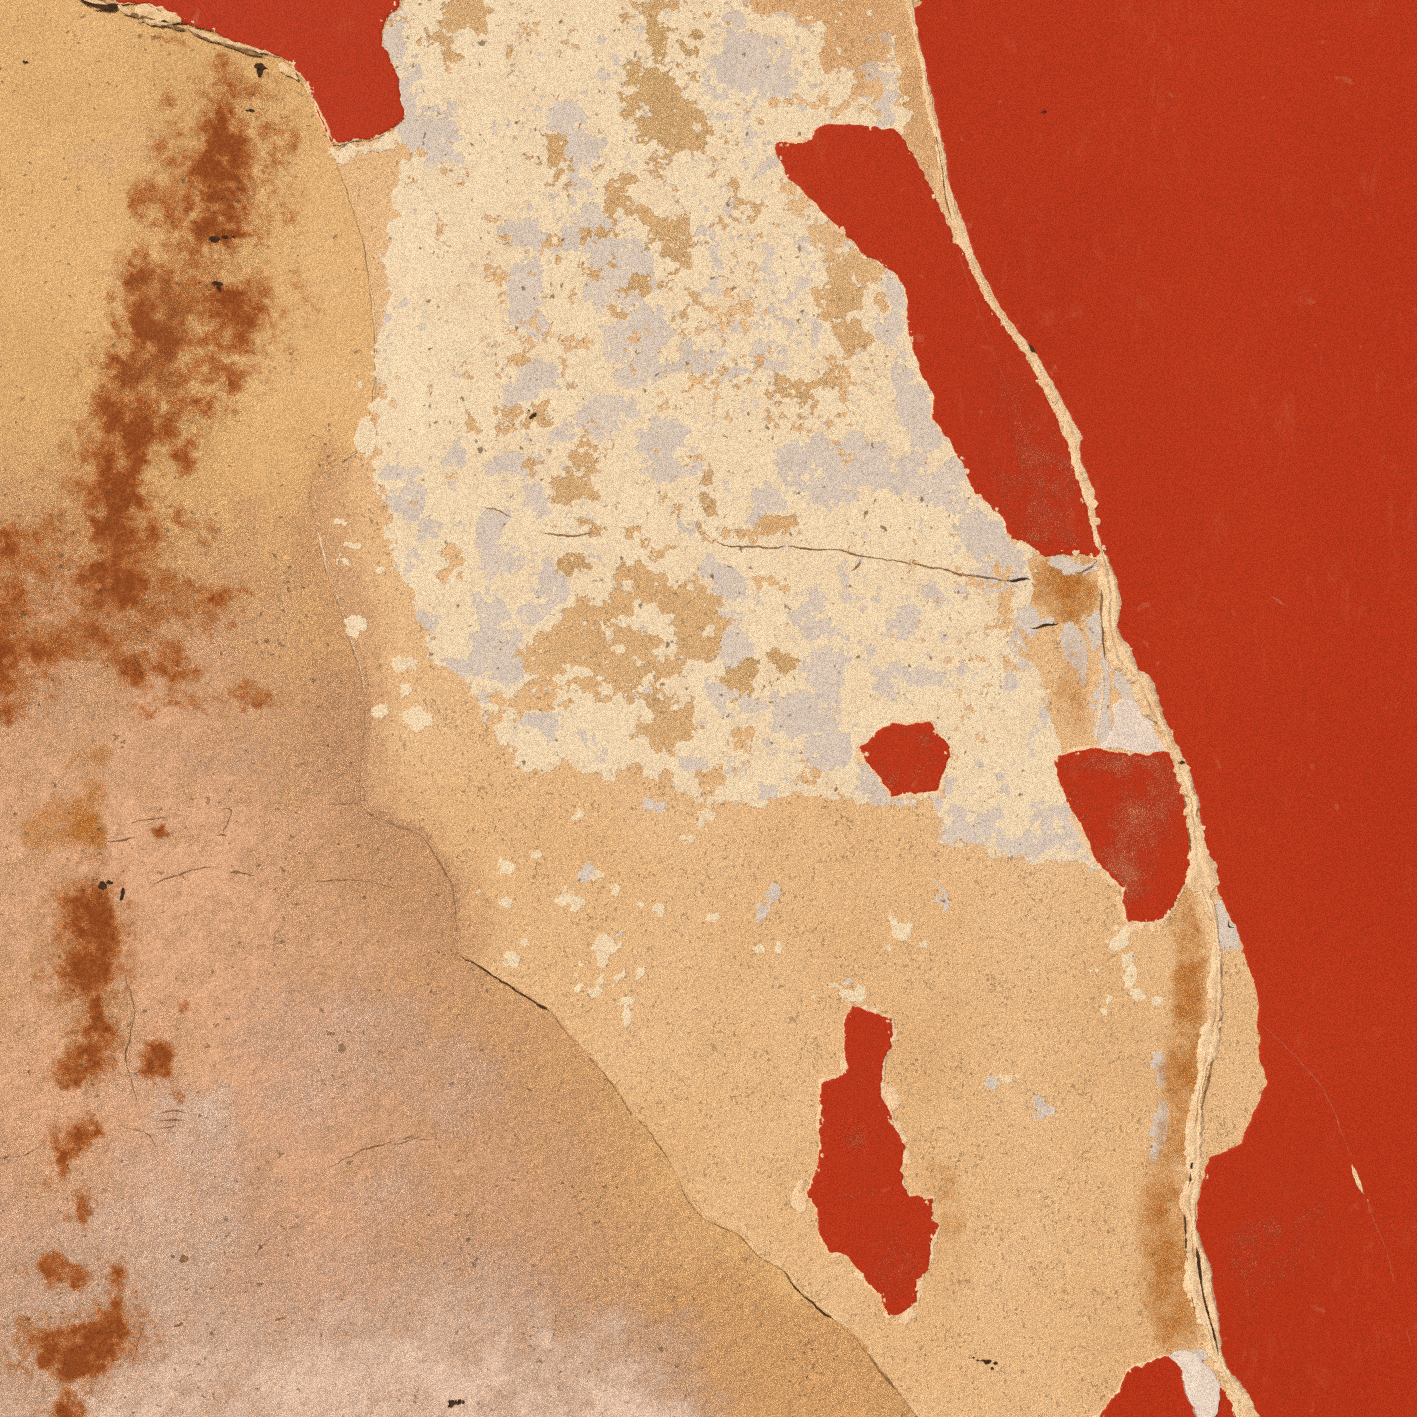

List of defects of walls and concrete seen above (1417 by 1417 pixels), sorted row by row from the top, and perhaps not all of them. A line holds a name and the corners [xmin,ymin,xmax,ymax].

corrosion [0,53,300,726]
spalling [0,0,376,751]
crack [703,532,1031,582]
crack [81,0,921,1417]
peeling [310,0,1230,1417]
corrosion [151,824,170,839]
corrosion [43,1112,104,1187]
corrosion [40,880,133,1090]
corrosion [139,1040,175,1078]
peeling [1200,887,1267,1180]
corrosion [36,1250,91,1292]
corrosion [11,1257,147,1417]